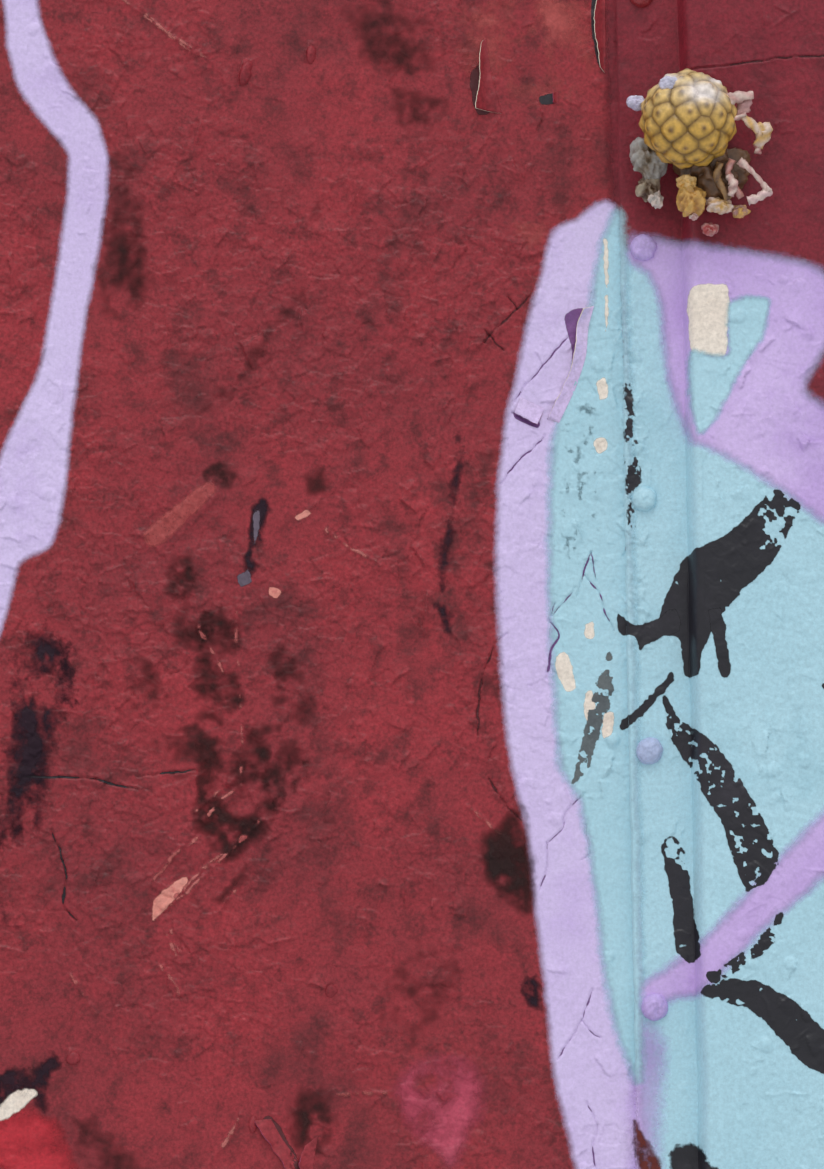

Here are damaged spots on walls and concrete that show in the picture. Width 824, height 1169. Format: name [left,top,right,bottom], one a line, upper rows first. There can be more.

peeling [591,0,606,73]
peeling [470,38,502,115]
peeling [513,239,609,428]
peeling [687,284,770,433]
peeling [594,438,608,453]
peeling [584,622,595,639]
peeling [555,652,614,738]
peeling [254,1116,318,1169]